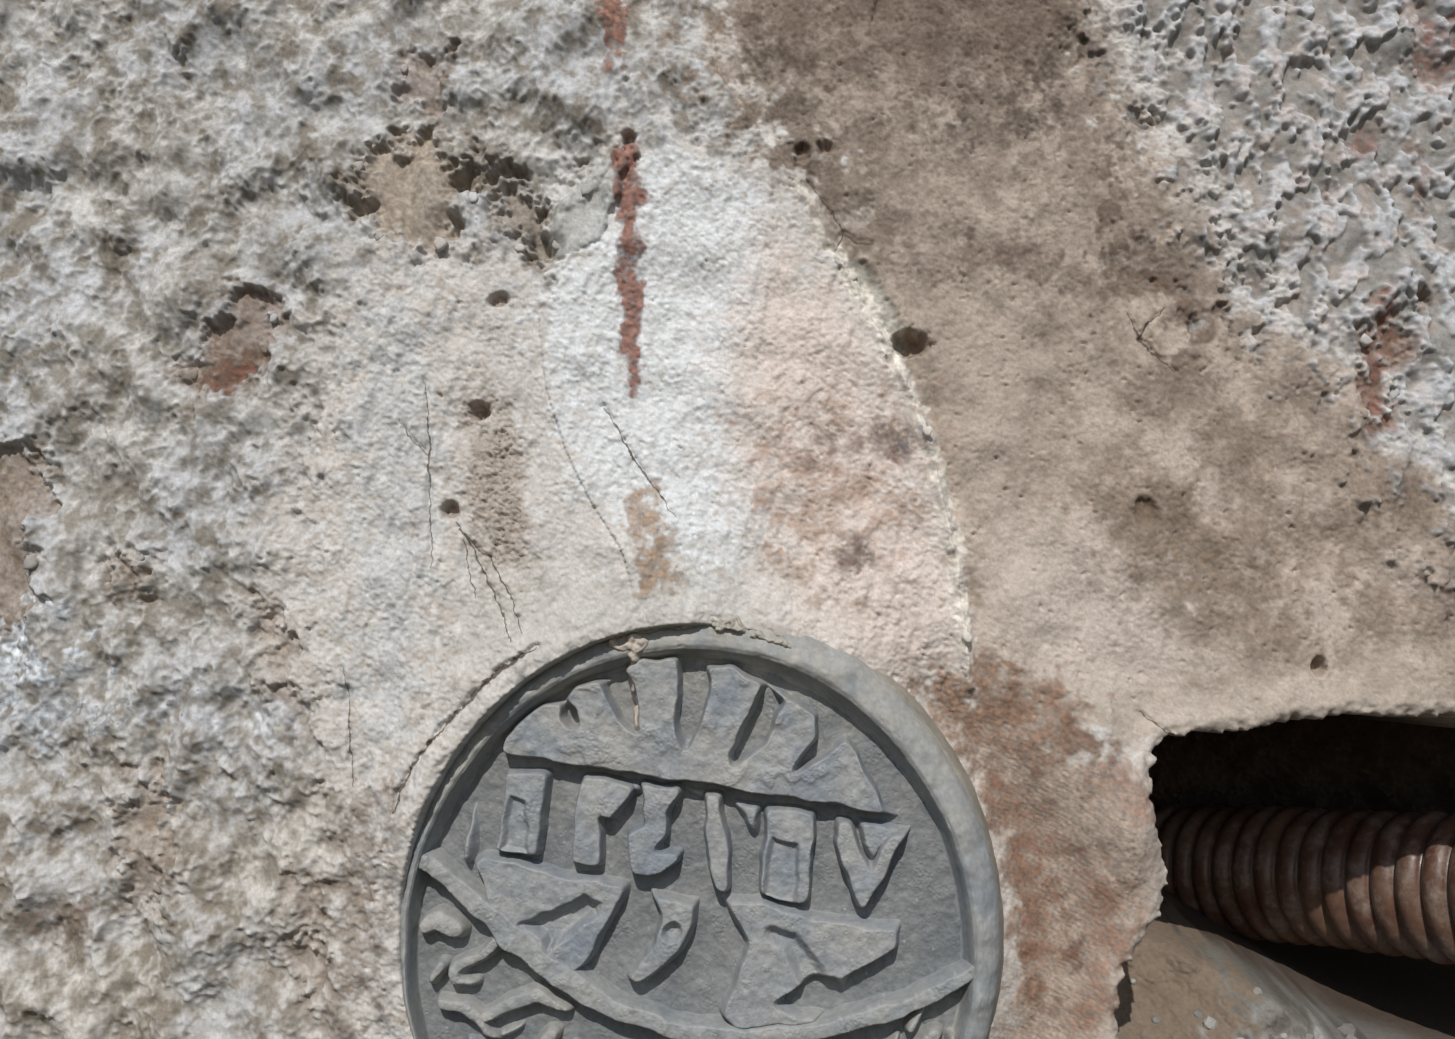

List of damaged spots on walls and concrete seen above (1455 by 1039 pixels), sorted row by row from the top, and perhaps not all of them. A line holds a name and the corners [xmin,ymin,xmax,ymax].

corrosion [597,0,628,72]
crack [806,178,874,250]
corrosion [611,143,648,397]
spalling [1149,714,1455,815]
spalling [1114,888,1455,1039]